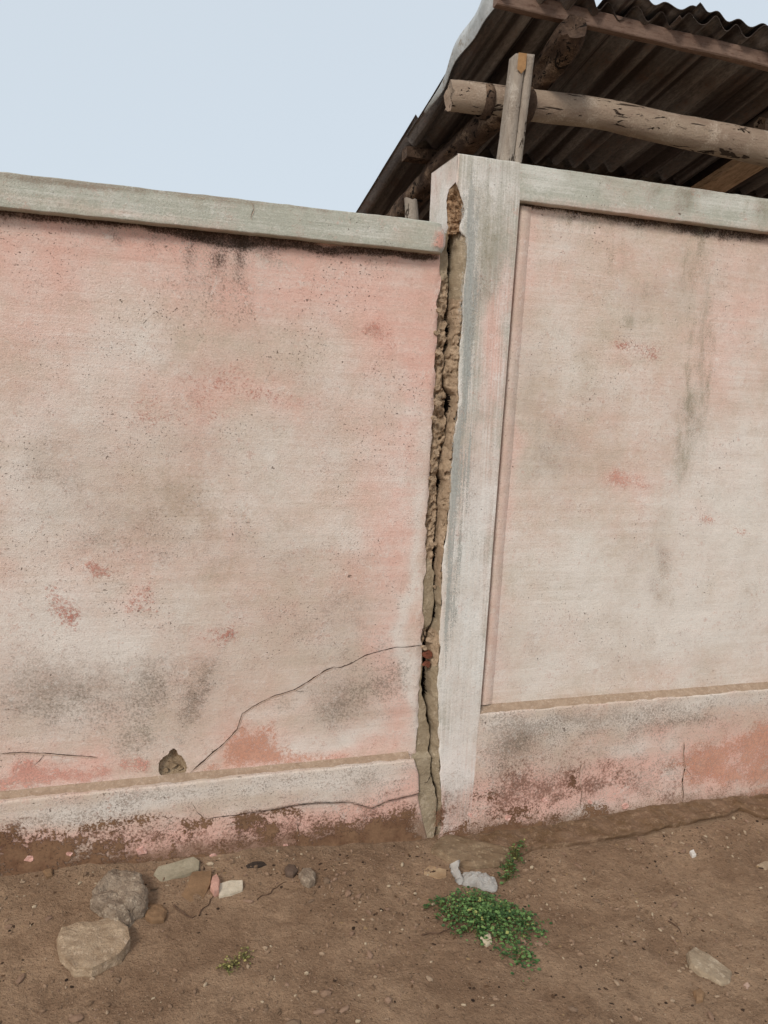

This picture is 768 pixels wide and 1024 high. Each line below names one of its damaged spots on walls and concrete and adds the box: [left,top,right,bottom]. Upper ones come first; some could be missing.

leakage [0,210,439,265]
crack [443,239,451,355]
crack [443,391,451,420]
crack [190,532,437,773]
leakage [485,759,638,819]
leakage [66,813,336,856]